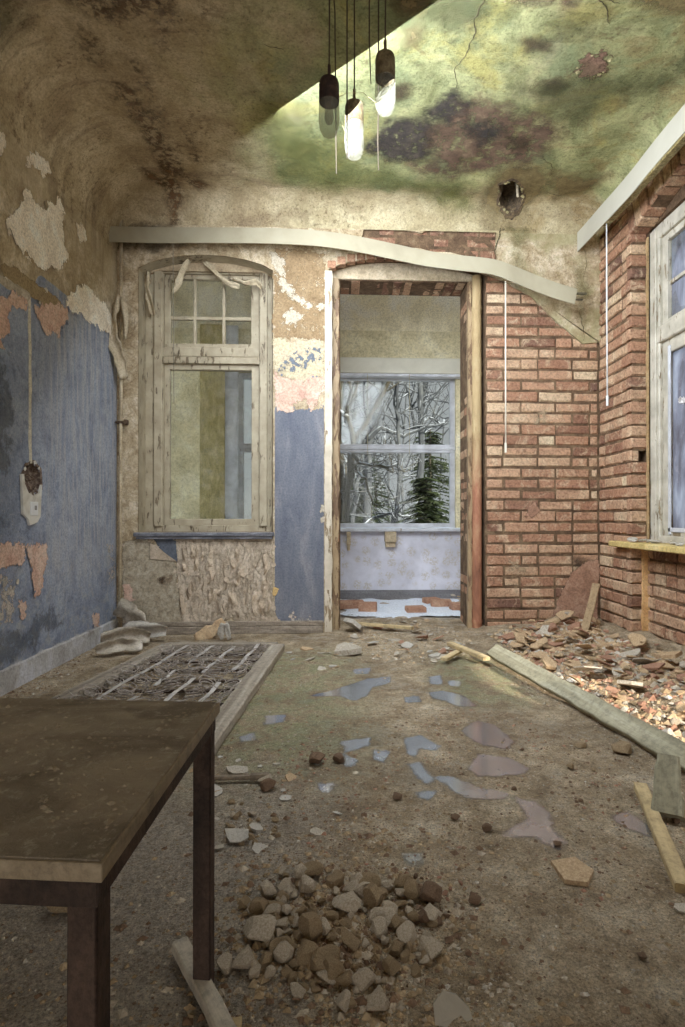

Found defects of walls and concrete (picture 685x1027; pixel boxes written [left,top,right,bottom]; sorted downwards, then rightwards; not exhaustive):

peeling [0,188,112,356]
spalling [21,460,43,495]
peeling [0,541,48,624]